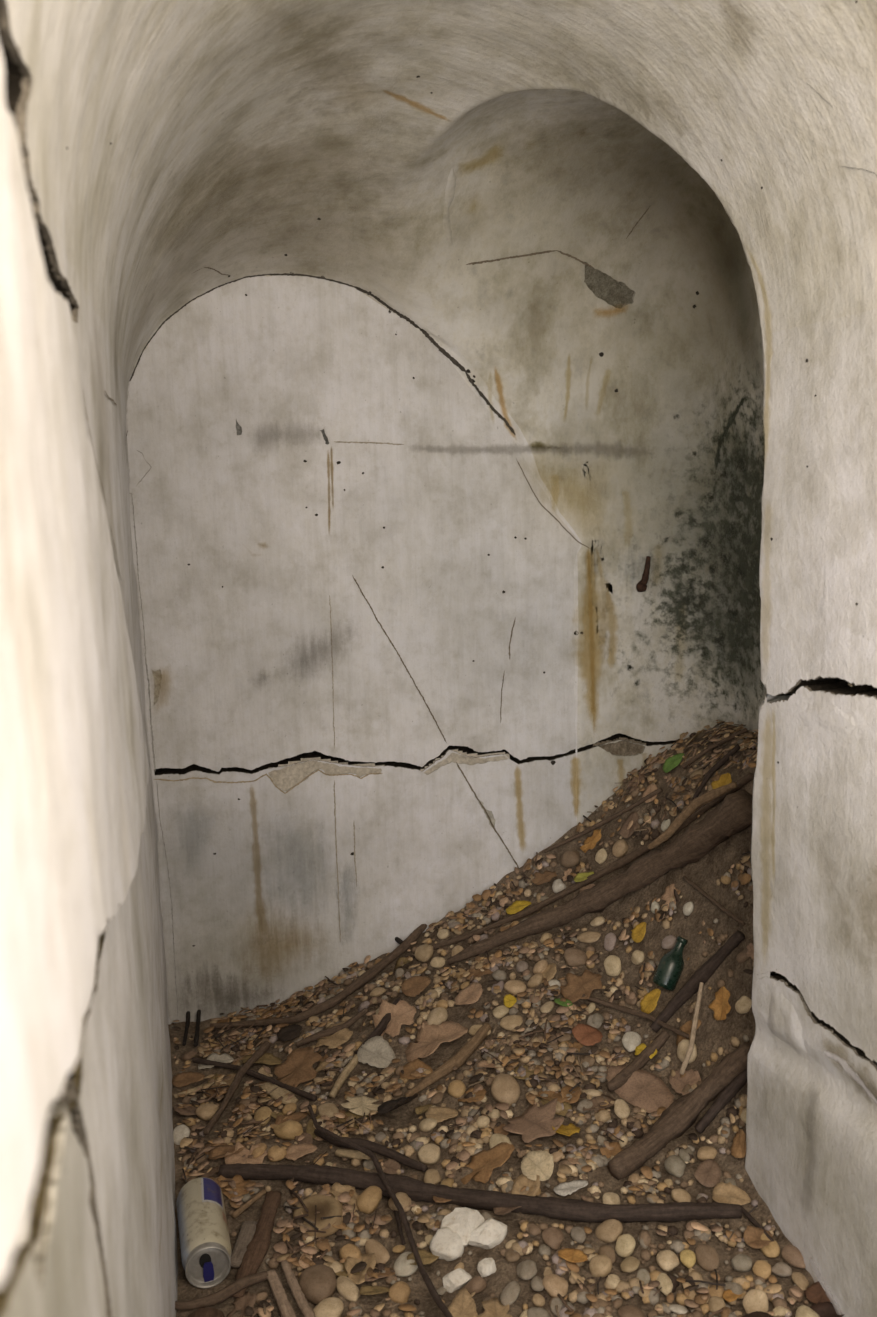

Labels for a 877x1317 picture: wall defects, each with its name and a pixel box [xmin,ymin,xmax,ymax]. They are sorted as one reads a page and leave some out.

crack [0,0,80,323]
spalling [584,262,635,309]
crack [154,575,677,869]
crack [516,459,590,549]
water stain [666,386,765,707]
crack [766,676,877,704]
crack [0,924,112,1317]
crack [762,971,877,1070]